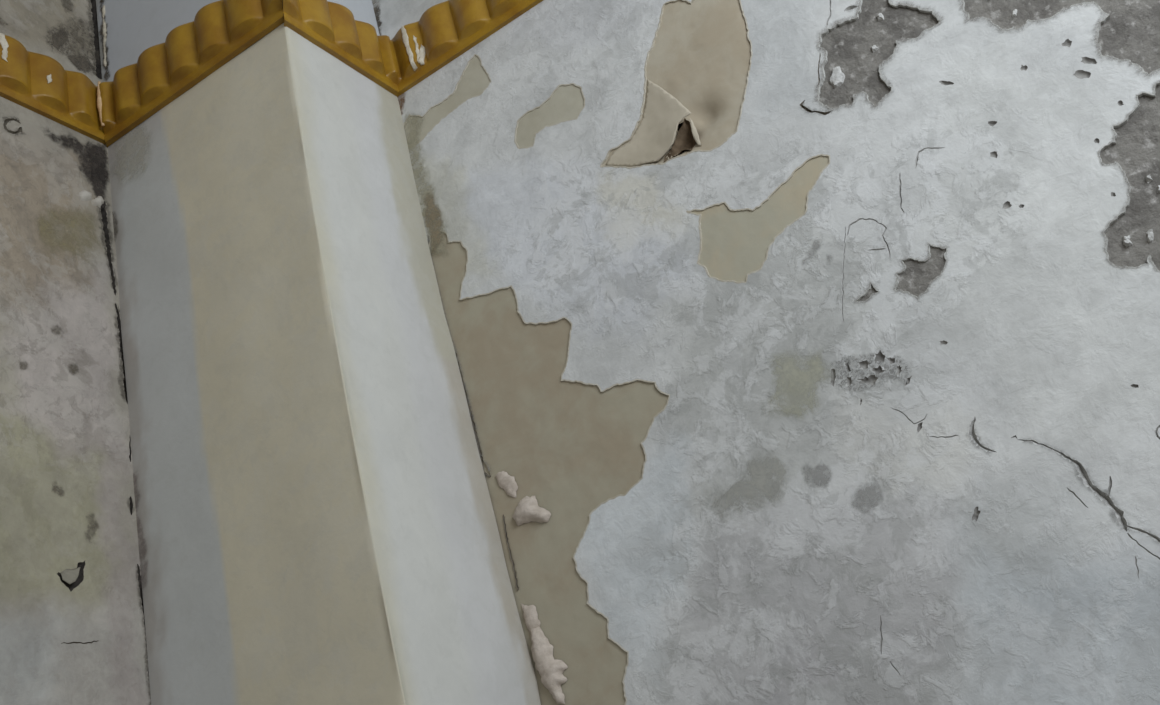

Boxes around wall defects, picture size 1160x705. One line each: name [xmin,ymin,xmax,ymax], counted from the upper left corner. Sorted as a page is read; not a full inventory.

spalling [401,26,426,71]
peeling [403,54,491,144]
peeling [514,83,585,149]
peeling [600,0,753,169]
spalling [815,0,941,111]
spalling [961,0,1160,272]
peeling [686,154,830,284]
spalling [894,242,948,300]
spalling [831,351,912,405]
peeling [429,230,670,705]
crack [890,407,1160,578]
peeling [57,561,85,591]